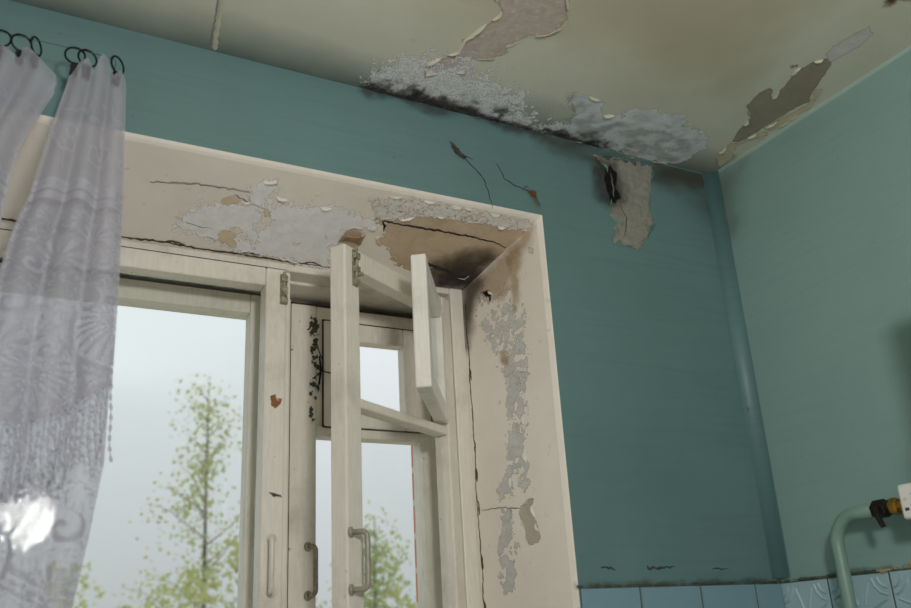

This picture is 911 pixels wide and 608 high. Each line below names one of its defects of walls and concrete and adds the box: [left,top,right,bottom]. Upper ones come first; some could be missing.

peeling [424,0,569,76]
water stain [360,39,608,148]
peeling [715,59,831,166]
peeling [171,177,534,271]
crack [450,142,541,208]
peeling [542,92,709,250]
peeling [476,287,540,594]